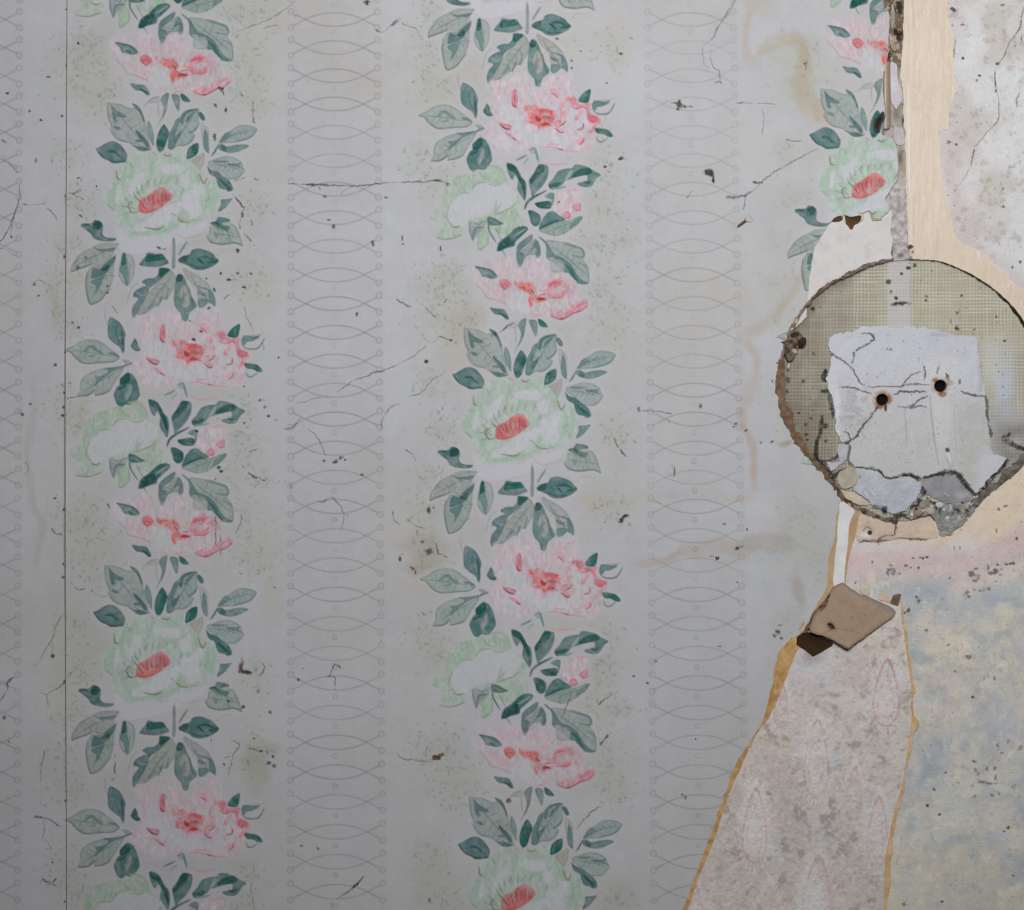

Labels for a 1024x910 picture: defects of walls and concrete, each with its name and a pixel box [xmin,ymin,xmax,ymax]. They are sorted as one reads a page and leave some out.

flaking render [883,0,916,306]
crack [814,333,1024,496]